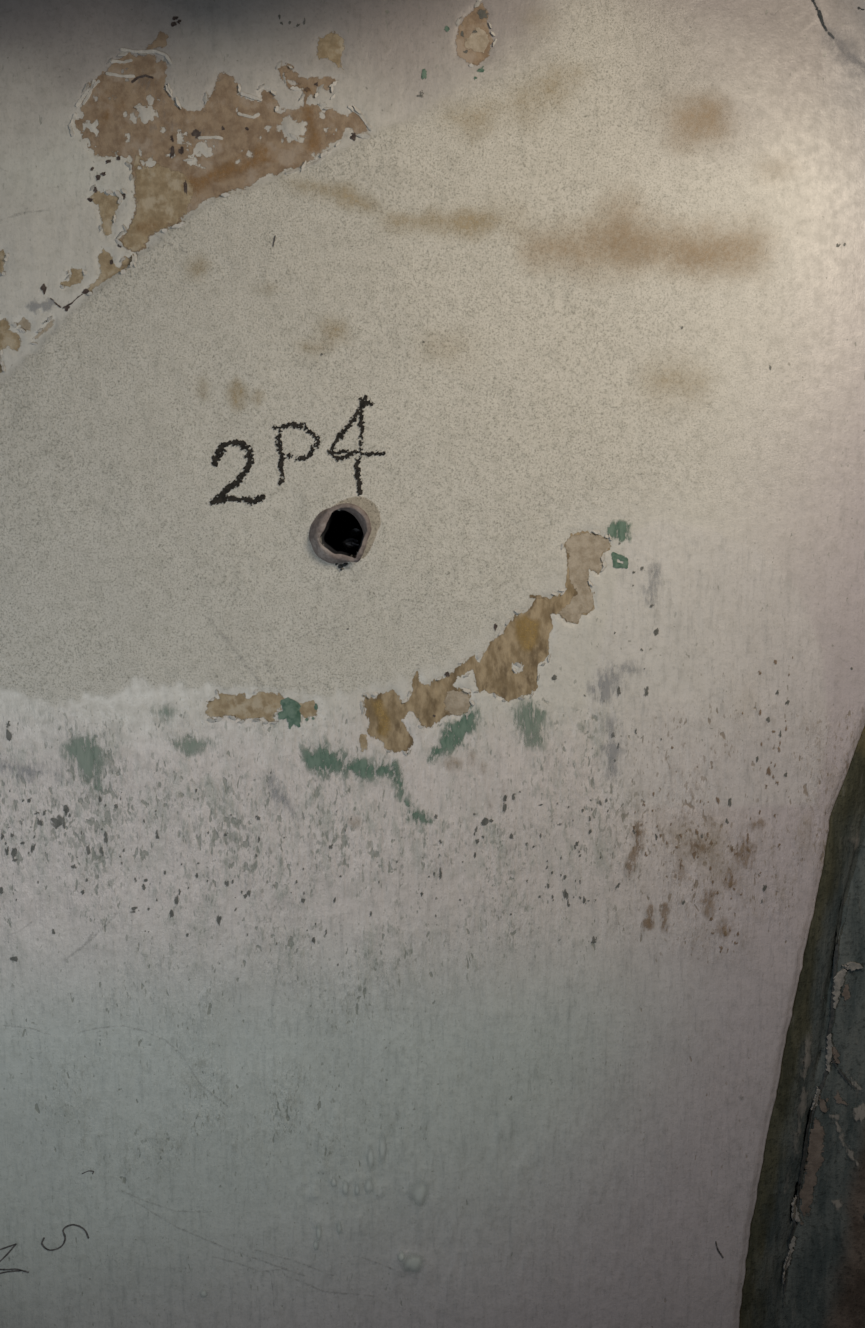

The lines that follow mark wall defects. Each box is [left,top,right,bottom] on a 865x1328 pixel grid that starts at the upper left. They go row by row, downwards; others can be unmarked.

spalling [444,0,497,80]
crack [812,0,850,60]
peeling [0,16,372,372]
peeling [359,530,612,756]
peeling [205,689,318,729]
peeling [830,1078,865,1166]